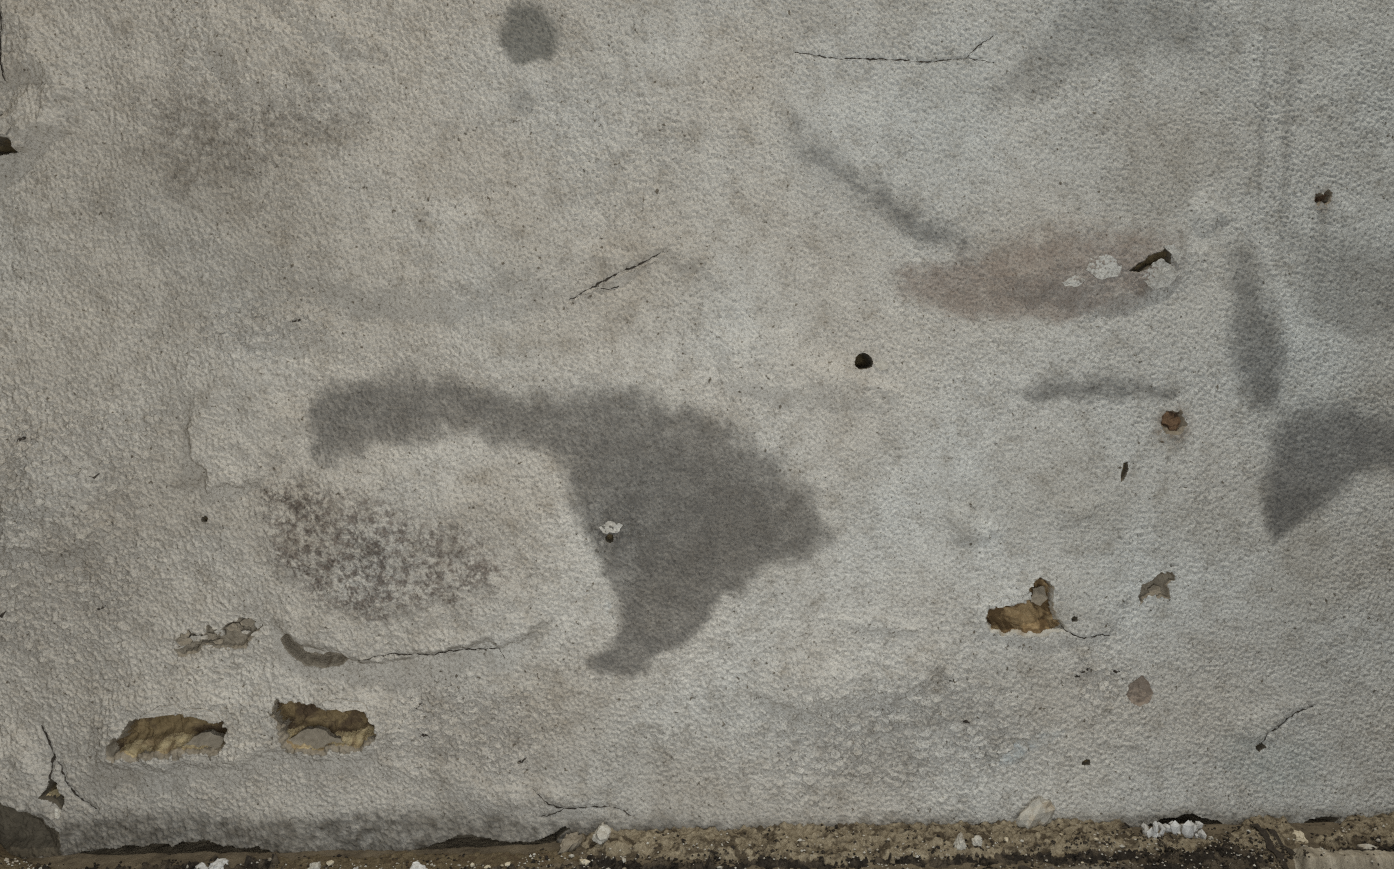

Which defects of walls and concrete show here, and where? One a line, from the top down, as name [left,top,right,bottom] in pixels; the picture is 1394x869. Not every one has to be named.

spalling [0,115,22,156]
spalling [1062,244,1183,289]
spalling [1160,410,1188,435]
spalling [982,577,1078,640]
spalling [1138,571,1175,606]
spalling [1074,652,1154,707]
spalling [105,704,227,765]
spalling [262,698,376,760]